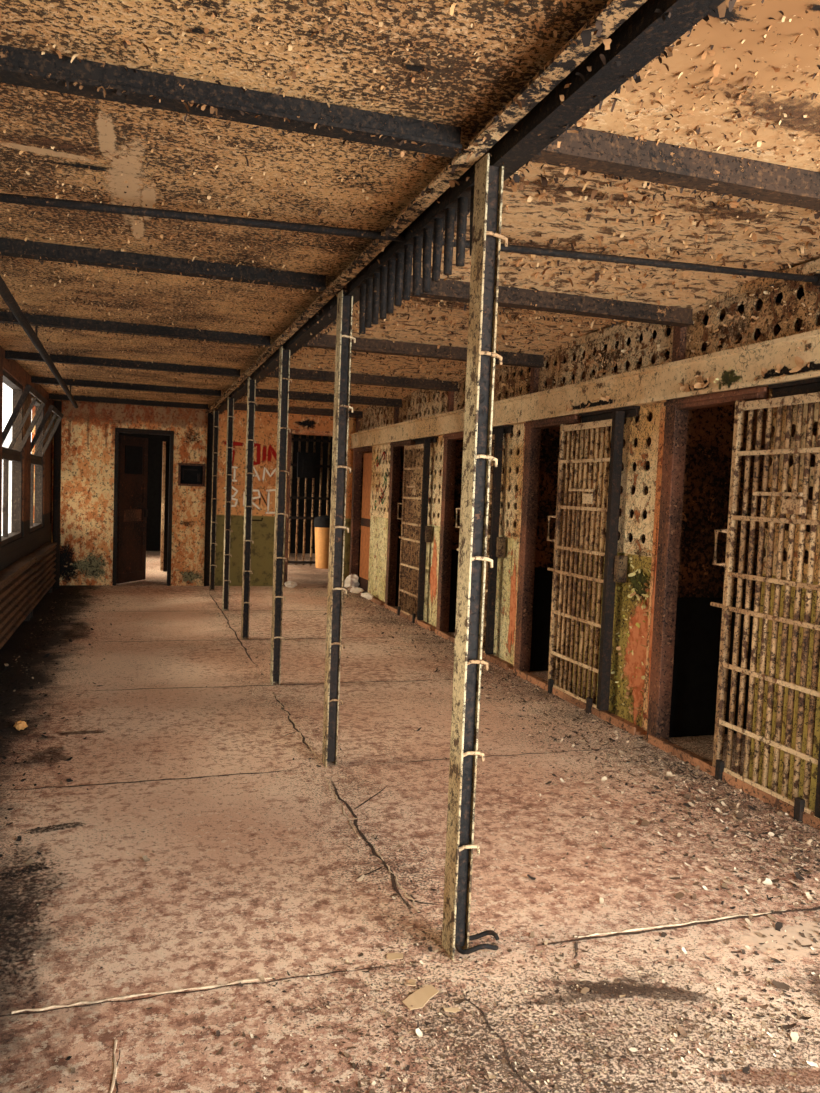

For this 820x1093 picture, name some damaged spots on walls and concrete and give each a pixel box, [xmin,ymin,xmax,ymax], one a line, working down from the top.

flaking render [64,551,112,581]
flaking render [178,567,202,586]
peeling [598,544,657,709]
crack [0,593,450,913]
crack [477,748,613,758]
crack [517,907,820,958]
crack [0,964,401,1016]
crack [461,988,539,1093]